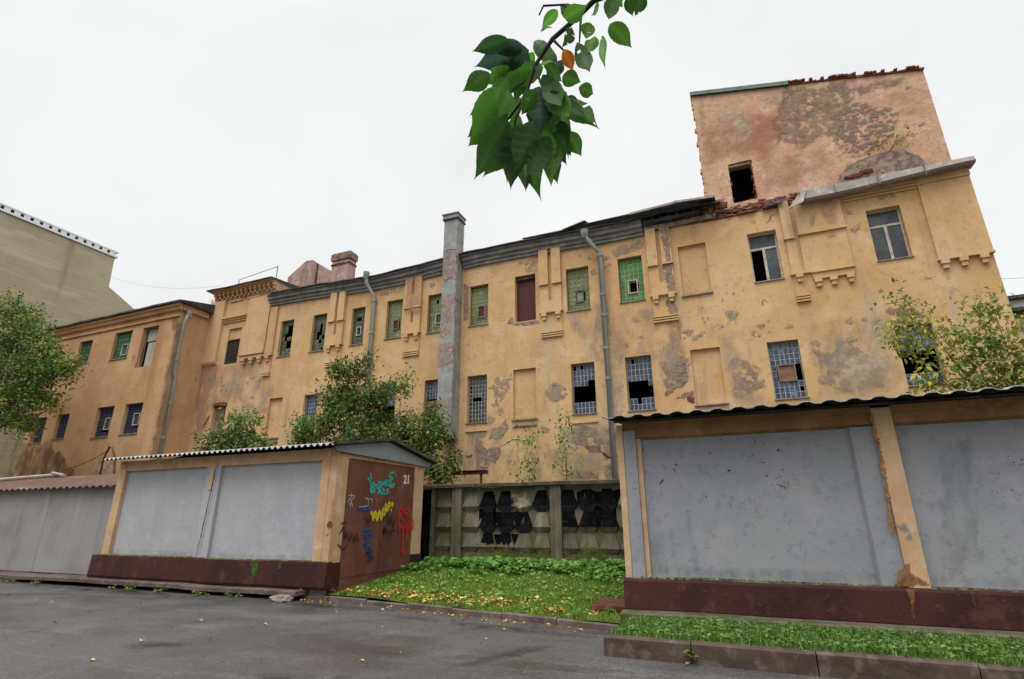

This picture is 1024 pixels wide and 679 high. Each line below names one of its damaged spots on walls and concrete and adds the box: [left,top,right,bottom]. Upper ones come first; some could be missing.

flaking render [429,249,458,288]
flaking render [437,293,456,368]
spalling [468,374,516,470]
peeling [545,383,566,401]
spalling [659,290,744,403]
peeling [730,358,764,397]
peeling [811,306,924,391]
peeling [869,413,895,532]
rust [897,564,927,610]